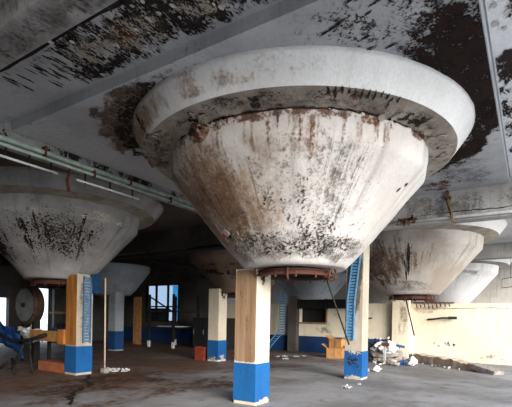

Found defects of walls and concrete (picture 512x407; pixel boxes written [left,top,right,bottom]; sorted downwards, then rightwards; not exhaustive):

leakage [42,146,152,187]
crack [209,106,374,124]
rust [209,95,380,160]
rust [390,112,430,141]
leakage [432,102,499,182]
leakage [0,204,126,264]
leakage [171,151,363,362]
crack [65,375,104,405]